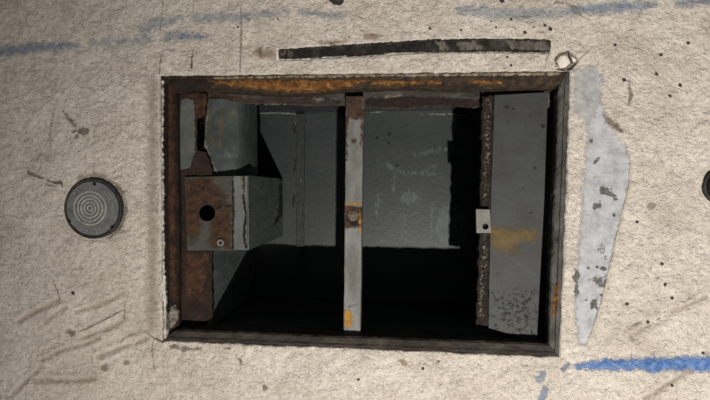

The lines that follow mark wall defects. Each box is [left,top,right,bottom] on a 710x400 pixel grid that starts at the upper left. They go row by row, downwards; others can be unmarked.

spalling [275,48,347,63]
rust [163,78,480,321]
spalling [160,51,578,357]